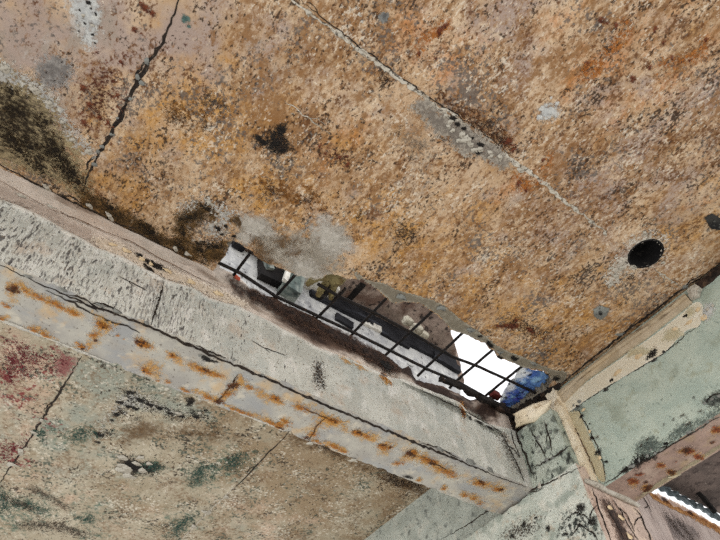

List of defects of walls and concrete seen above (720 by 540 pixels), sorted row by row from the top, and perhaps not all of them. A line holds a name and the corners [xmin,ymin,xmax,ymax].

crack [0,0,221,289]
damp [0,69,243,265]
crack [286,0,607,235]
peeling [0,320,115,368]
corrosion [0,280,125,351]
corrosion [134,338,171,384]
corrosion [168,353,293,430]
crack [182,431,290,540]
crack [0,265,583,492]
corrosion [293,402,398,455]
spalling [218,250,567,437]
corrosion [392,443,505,493]